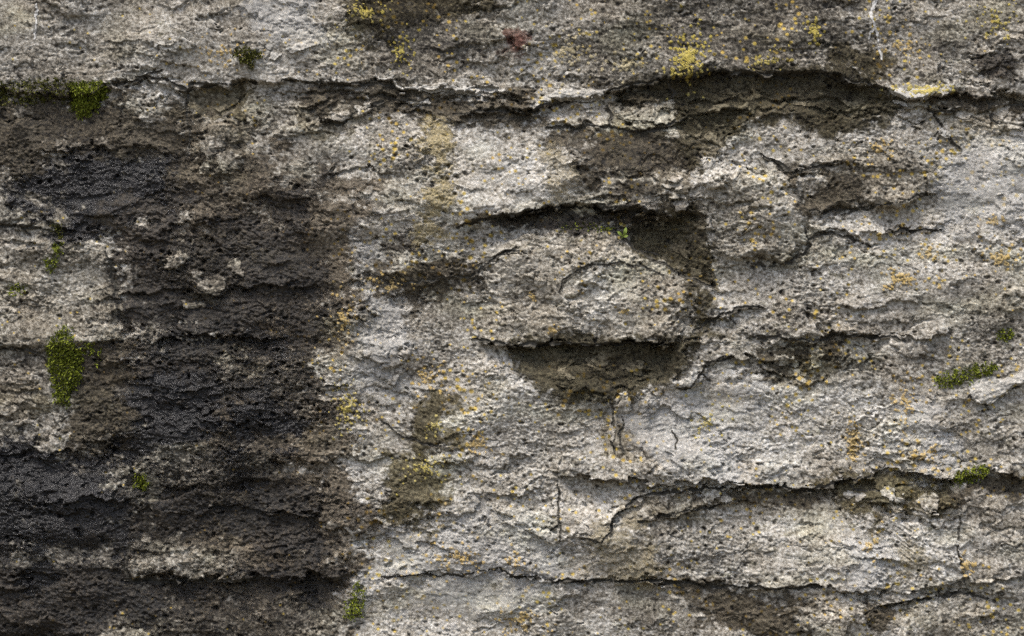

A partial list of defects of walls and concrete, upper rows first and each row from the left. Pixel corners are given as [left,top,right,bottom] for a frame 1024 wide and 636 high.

leakage [0,83,572,636]
crack [550,472,880,544]